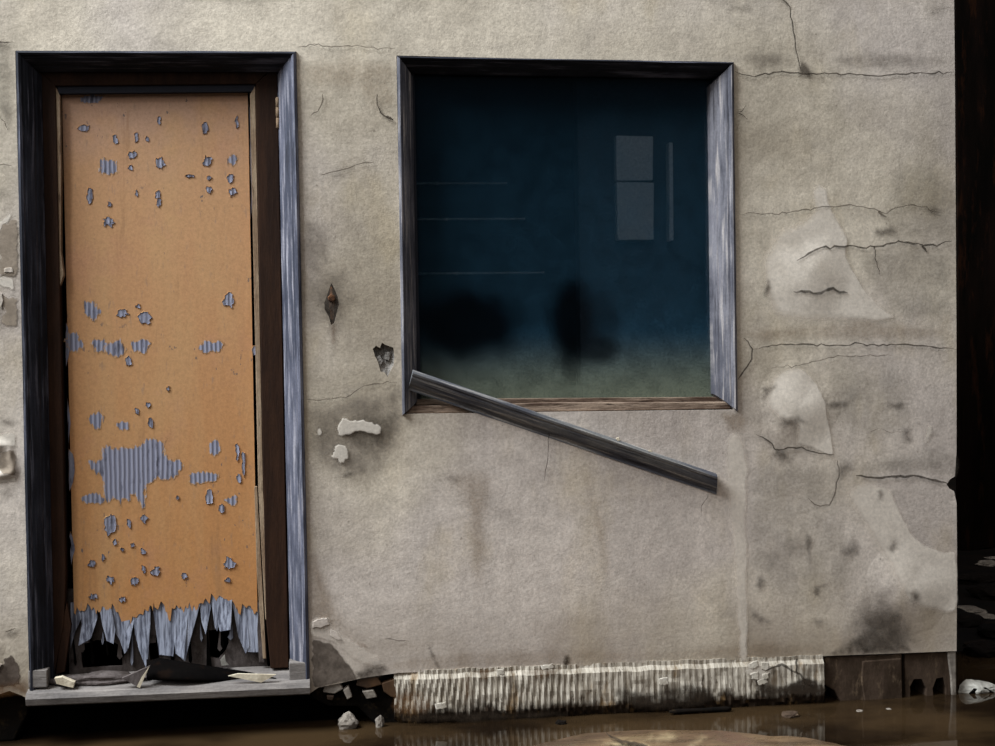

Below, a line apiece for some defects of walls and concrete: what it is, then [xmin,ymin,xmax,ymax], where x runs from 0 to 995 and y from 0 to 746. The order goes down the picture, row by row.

crack [735,0,950,77]
crack [745,204,942,217]
spalling [0,220,18,276]
crack [797,240,952,273]
crack [793,287,847,295]
spalling [0,292,17,326]
spalling [373,343,394,377]
crack [738,338,957,379]
spalling [0,450,16,475]
crack [758,435,948,507]
spalling [311,618,380,687]
spalling [0,656,20,687]